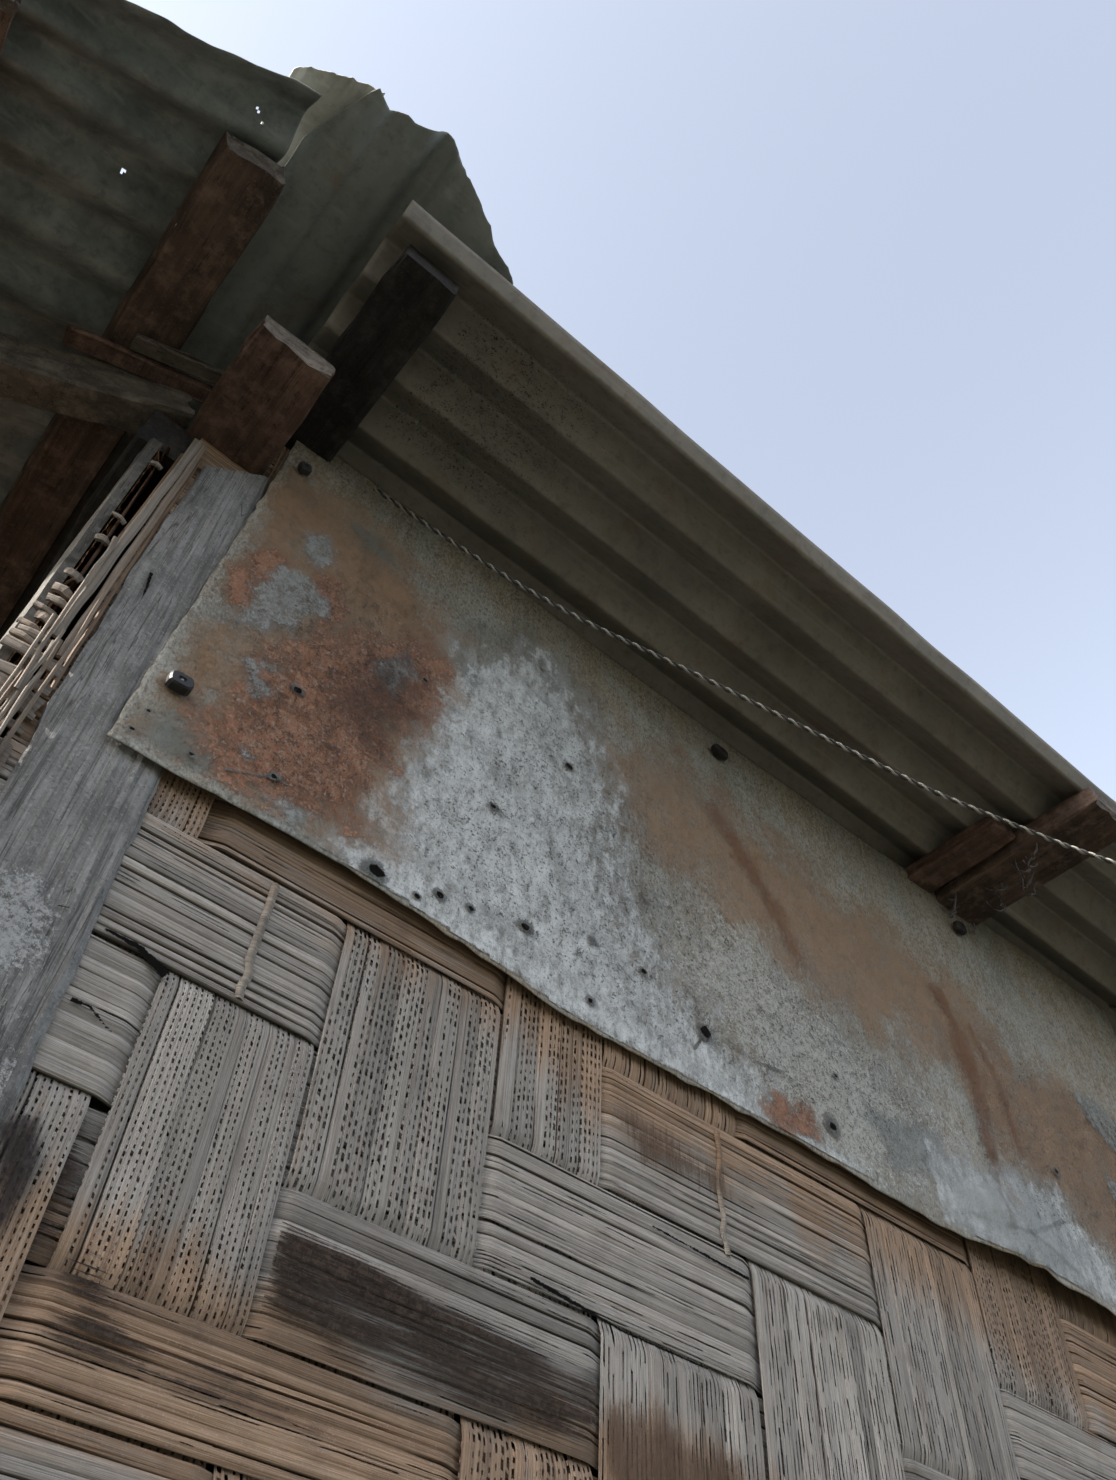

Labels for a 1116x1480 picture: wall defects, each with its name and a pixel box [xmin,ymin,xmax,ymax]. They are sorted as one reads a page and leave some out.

corrosion [224,540,294,610]
corrosion [168,570,456,838]
damp [0,1114,90,1265]
corrosion [758,1090,820,1142]
damp [260,1221,744,1480]